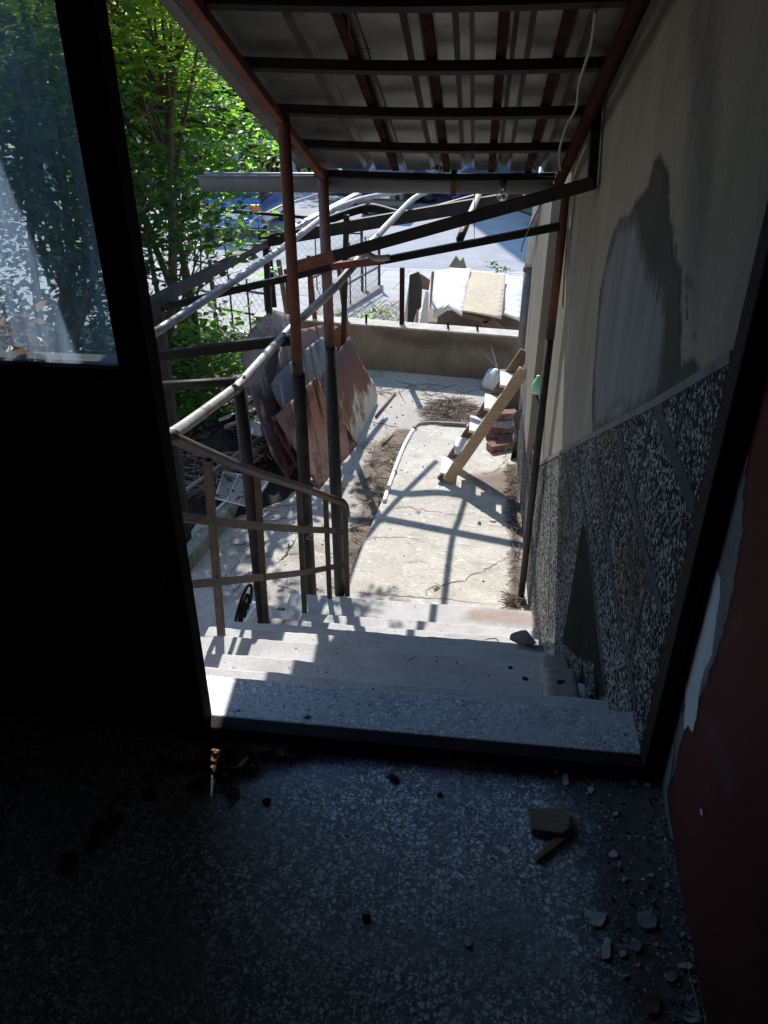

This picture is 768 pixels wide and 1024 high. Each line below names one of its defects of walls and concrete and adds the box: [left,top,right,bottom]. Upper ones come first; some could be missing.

damp [592,155,699,432]
crack [358,556,510,604]
peeling [645,335,768,842]